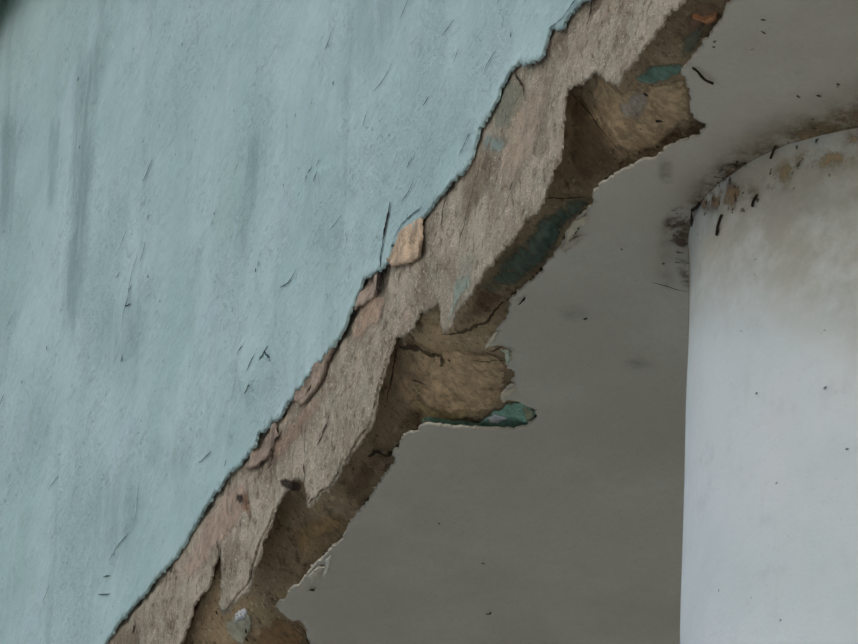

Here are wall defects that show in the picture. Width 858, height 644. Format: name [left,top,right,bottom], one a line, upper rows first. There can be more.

leakage [701,161,759,216]
mould [666,210,691,283]
spalling [107,0,686,644]